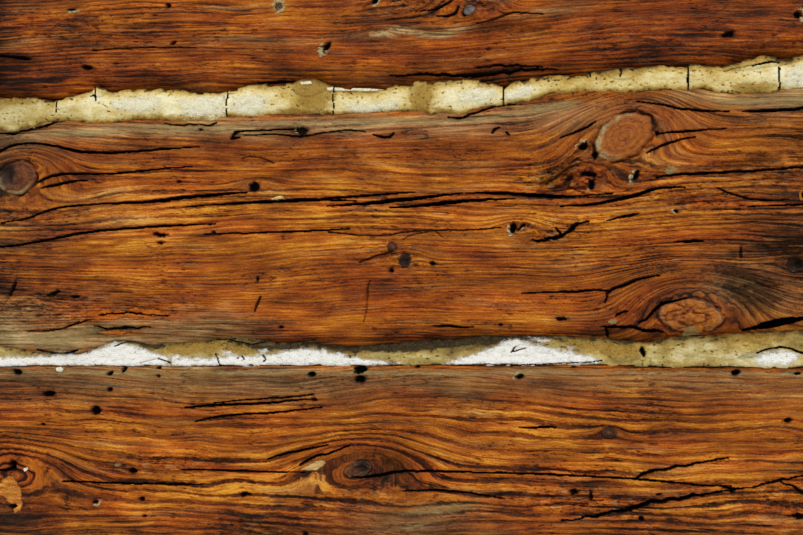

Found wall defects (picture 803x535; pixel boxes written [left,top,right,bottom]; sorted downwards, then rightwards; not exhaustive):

crack [0,96,200,189]
crack [164,86,395,140]
crack [560,121,596,138]
crack [636,61,803,154]
crack [0,166,803,263]
crack [351,457,803,521]